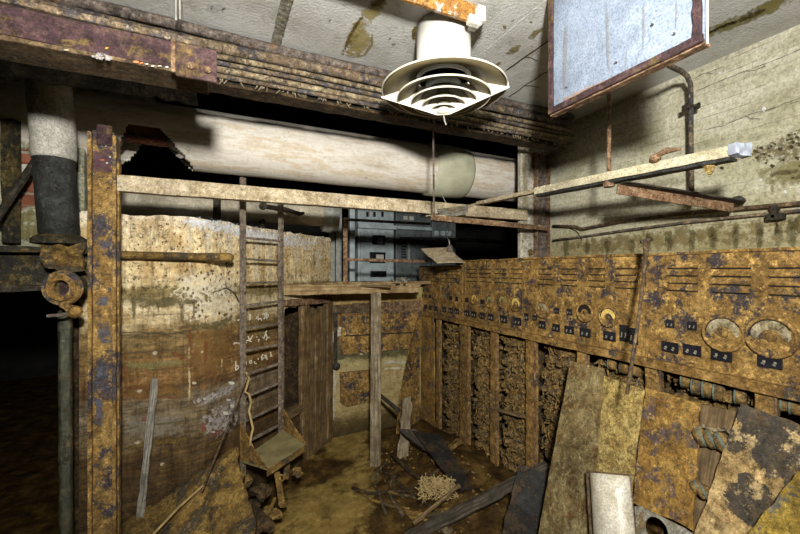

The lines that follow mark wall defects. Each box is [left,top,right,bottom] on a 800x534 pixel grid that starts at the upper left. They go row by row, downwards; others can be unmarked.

leakage [342,0,386,58]
leakage [709,0,785,36]
rust [93,146,112,172]
leakage [761,161,800,191]
leakage [564,221,764,256]
leakage [773,215,800,247]
leakage [131,297,198,320]
rust [97,323,112,343]